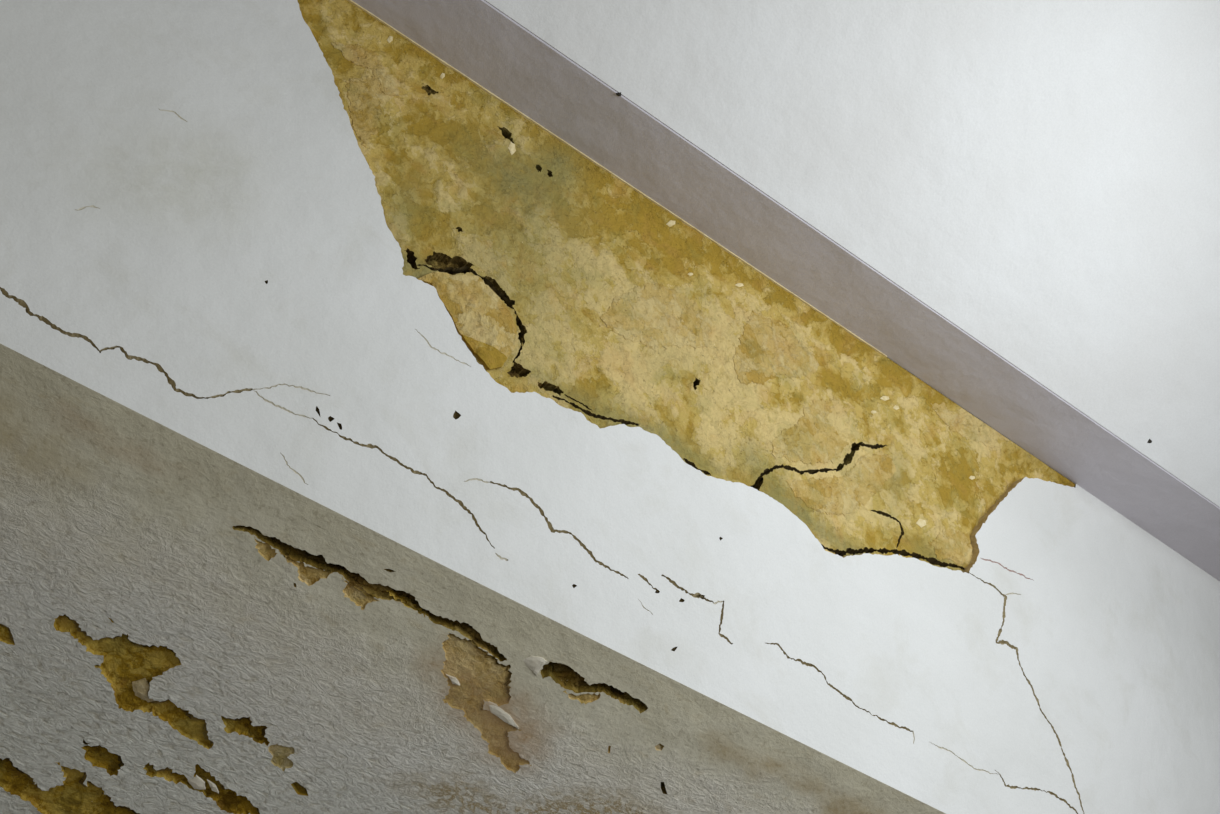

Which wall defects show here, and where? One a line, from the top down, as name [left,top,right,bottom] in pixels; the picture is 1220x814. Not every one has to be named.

spalling [297,0,1076,573]
crack [0,287,732,645]
peeling [0,624,15,645]
peeling [54,614,214,749]
peeling [232,525,648,773]
crack [766,558,1084,814]
peeling [0,739,140,814]
peeling [143,763,260,814]
peeling [221,716,308,796]